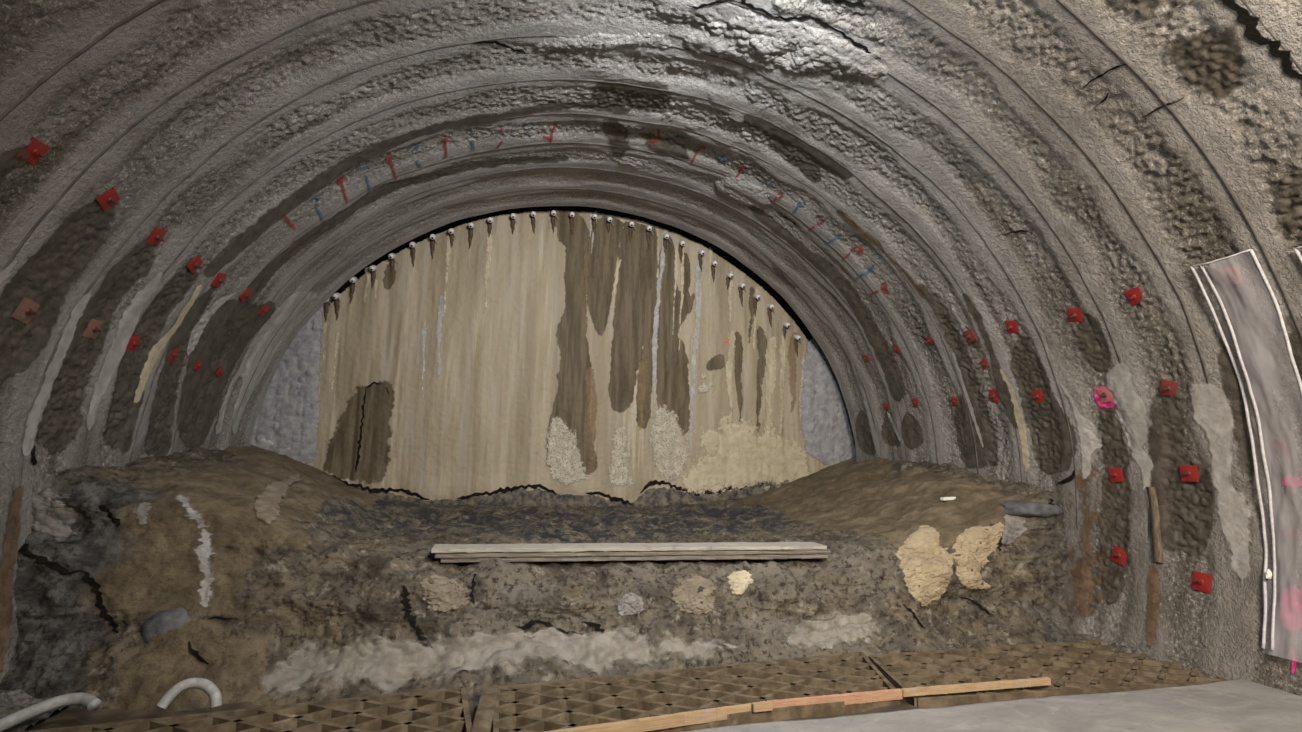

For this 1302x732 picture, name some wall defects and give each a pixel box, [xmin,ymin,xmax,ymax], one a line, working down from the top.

crack [687,0,881,60]
crack [1220,0,1302,81]
crack [1083,64,1127,108]
crack [1142,97,1184,118]
damp [0,80,689,456]
damp [510,211,811,494]
damp [323,381,394,484]